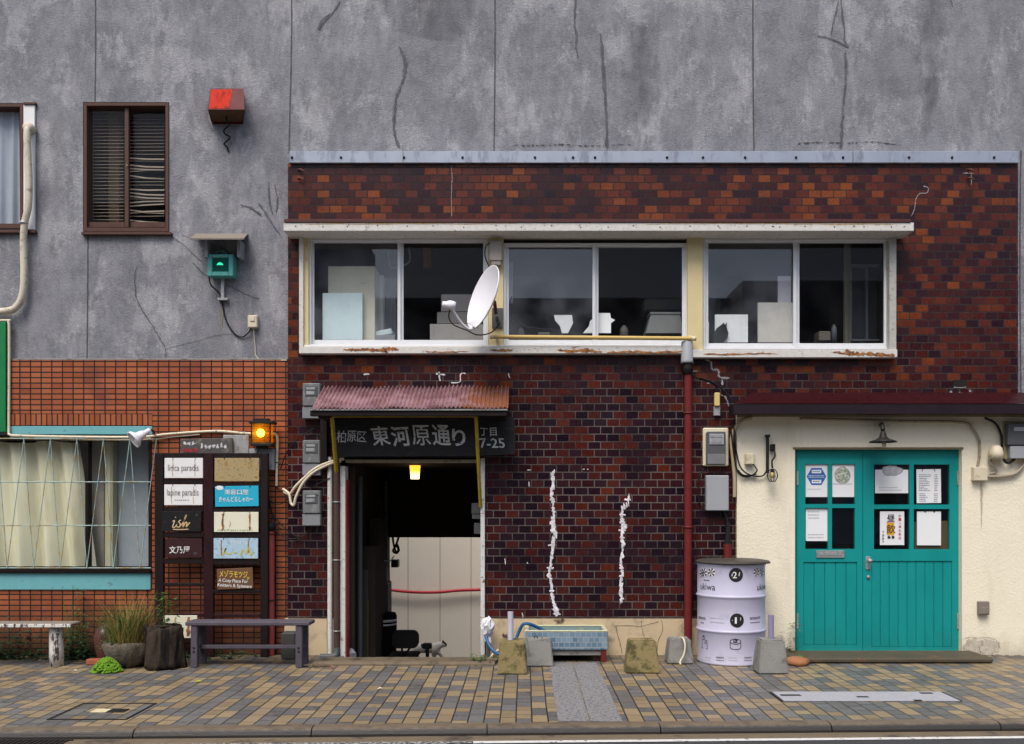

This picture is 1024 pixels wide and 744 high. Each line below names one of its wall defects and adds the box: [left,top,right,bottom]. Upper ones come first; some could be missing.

crack [317,1,340,30]
crack [392,47,408,148]
crack [574,0,608,148]
crack [818,0,849,148]
crack [241,181,280,234]
crack [134,268,233,356]
corrosion [833,349,895,357]